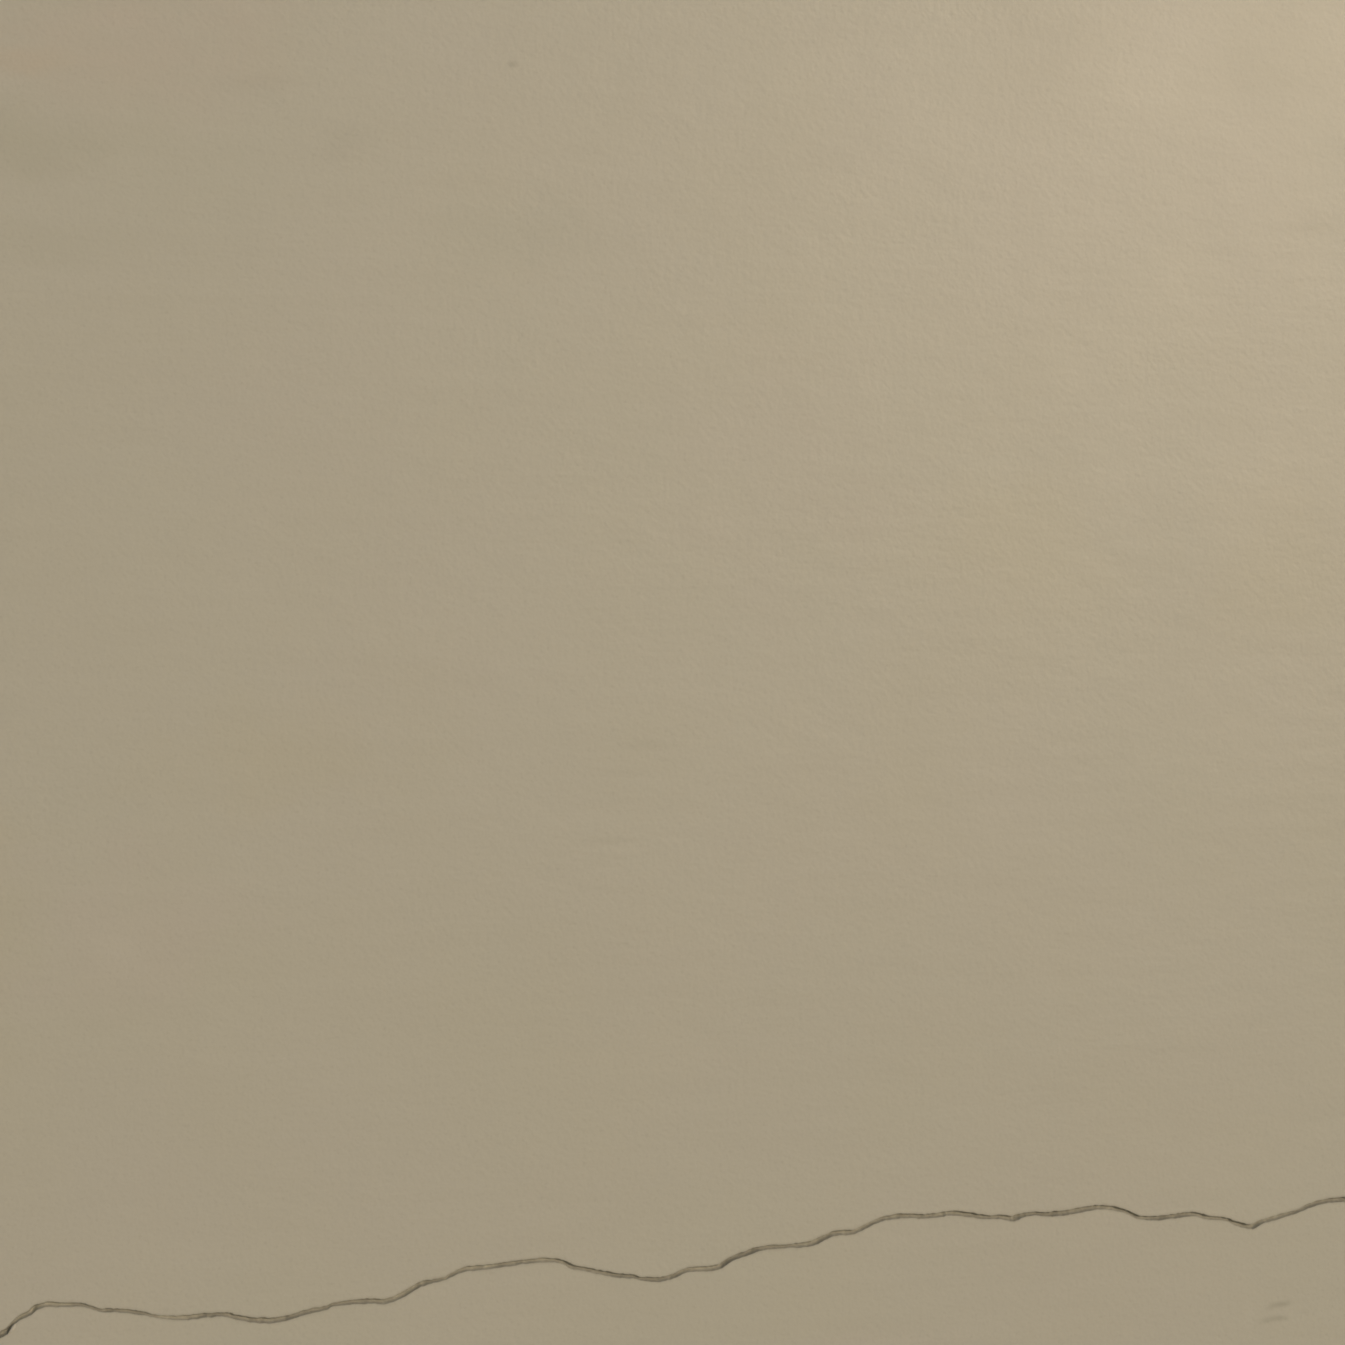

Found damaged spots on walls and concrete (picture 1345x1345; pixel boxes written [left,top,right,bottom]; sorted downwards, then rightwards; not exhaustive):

crack [0,1194,1345,1341]